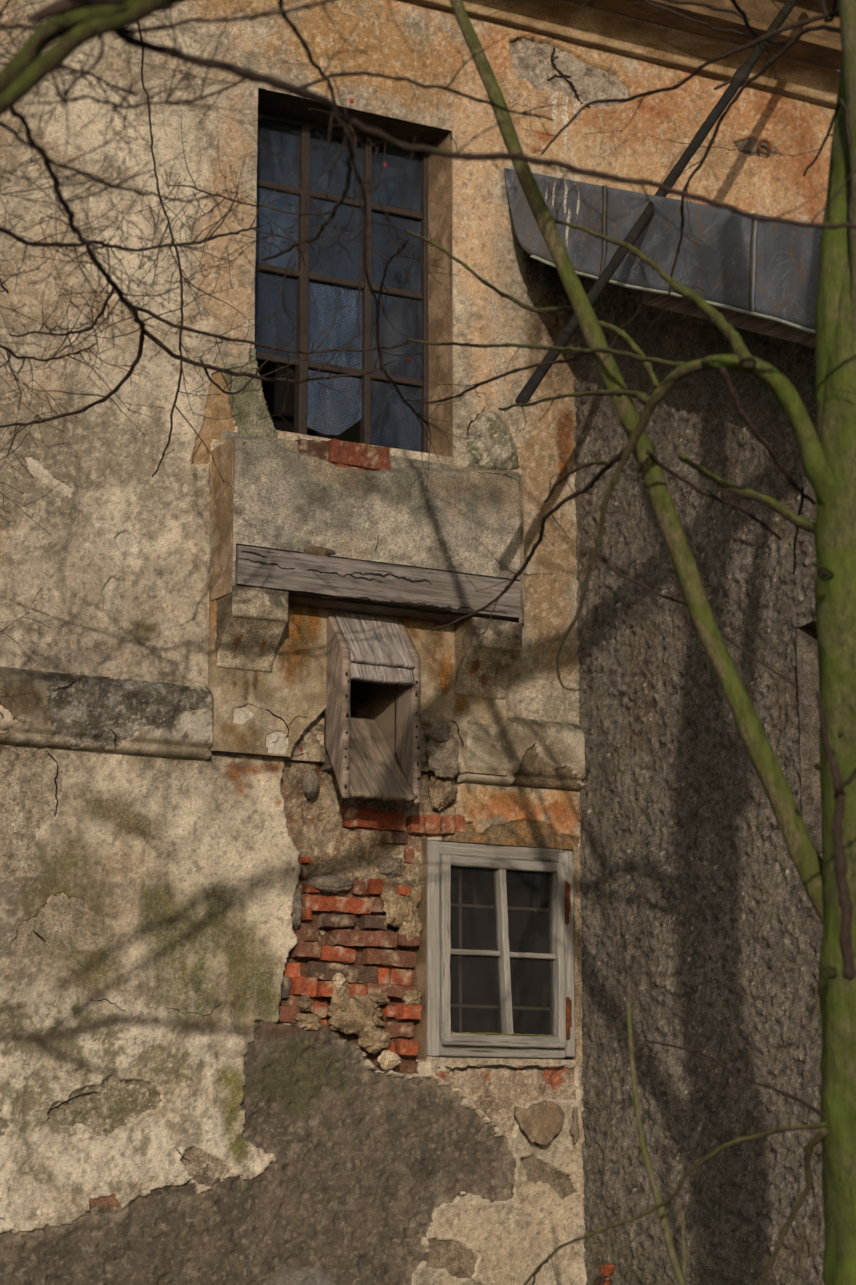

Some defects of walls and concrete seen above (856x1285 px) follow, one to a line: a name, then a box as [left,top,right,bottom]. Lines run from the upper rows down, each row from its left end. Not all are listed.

spalling [509,37,632,109]
spalling [733,138,778,158]
flaking render [192,371,235,465]
crack [46,750,59,817]
peeling [0,678,208,881]
spalling [0,719,582,1285]